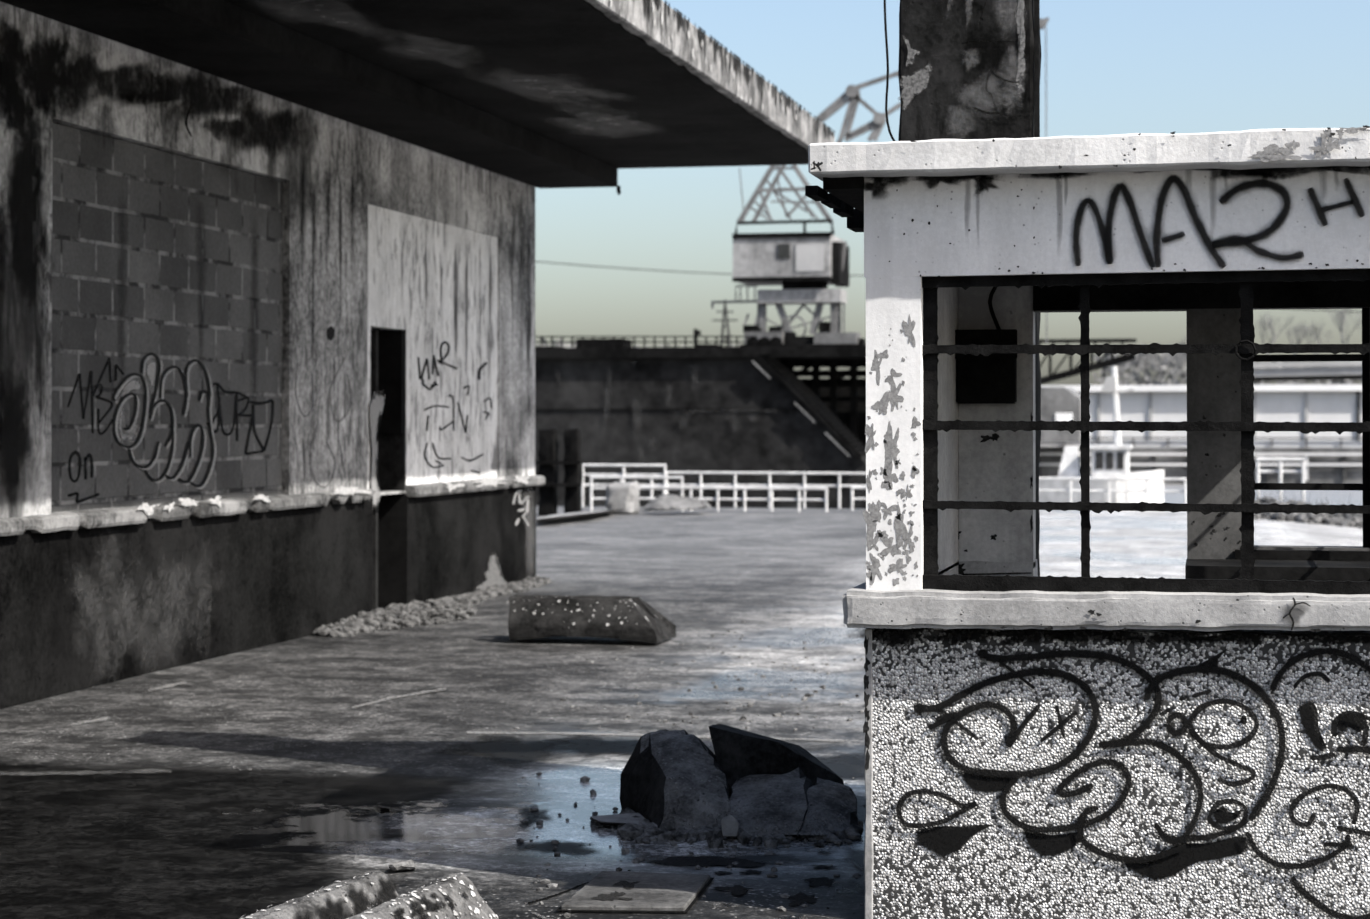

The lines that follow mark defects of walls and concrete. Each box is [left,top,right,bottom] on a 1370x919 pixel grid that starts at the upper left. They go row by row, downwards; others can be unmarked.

peeling [0,24,301,306]
damp [269,117,354,290]
damp [499,77,640,132]
flaking render [899,36,932,110]
peeling [1248,125,1370,162]
damp [0,215,41,408]
peeling [862,314,921,586]